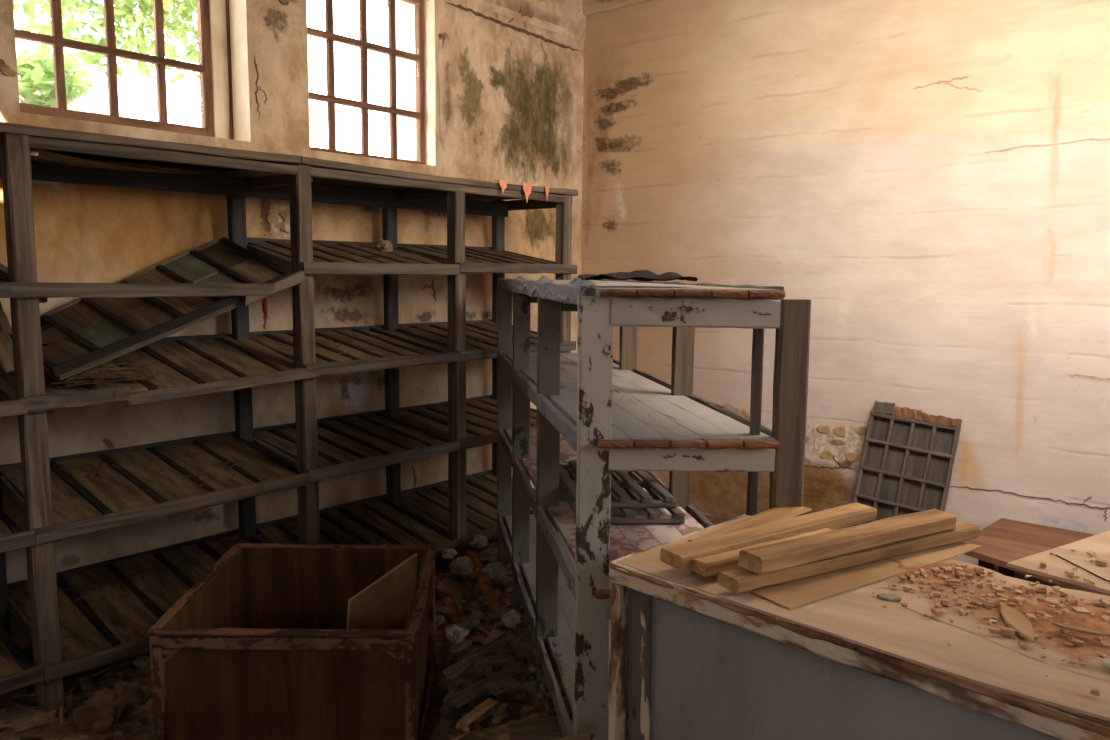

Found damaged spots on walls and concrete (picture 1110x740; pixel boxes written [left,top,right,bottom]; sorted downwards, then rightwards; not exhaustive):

water stain [253,0,302,46]
crack [908,74,988,92]
water stain [476,0,636,260]
crack [961,137,1110,157]
water stain [1043,47,1066,286]
peeling [805,419,869,467]
crack [950,485,1110,522]